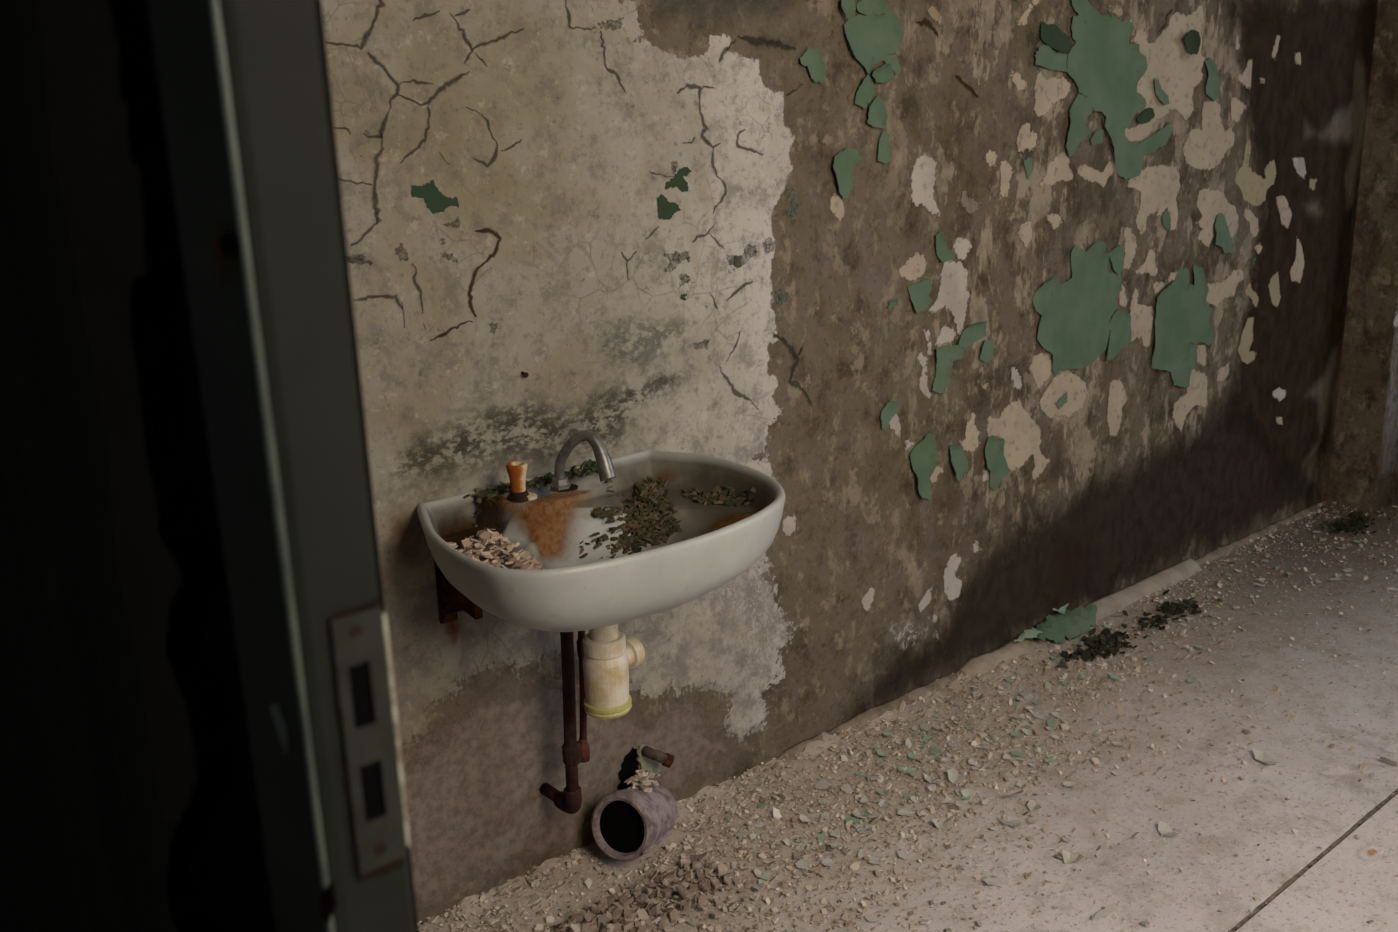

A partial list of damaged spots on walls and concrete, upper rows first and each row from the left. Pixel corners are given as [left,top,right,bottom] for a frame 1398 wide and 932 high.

crack [326,0,524,246]
crack [565,0,626,93]
crack [677,35,796,249]
peeling [800,47,826,84]
peeling [829,0,902,225]
crack [353,228,502,341]
crack [621,226,659,280]
crack [709,281,812,410]
peeling [880,0,1317,500]
peeling [1381,312,1398,475]
peeling [861,587,875,613]
peeling [918,540,982,623]